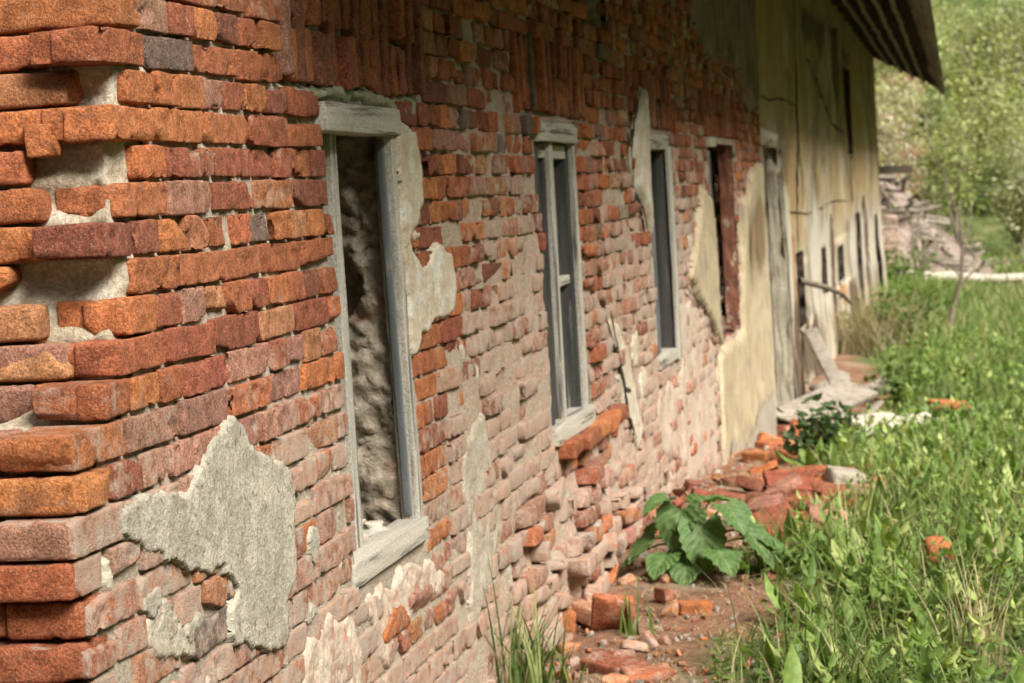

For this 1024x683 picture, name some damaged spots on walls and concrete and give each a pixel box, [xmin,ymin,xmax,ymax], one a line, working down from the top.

peeling [394,122,457,355]
peeling [629,85,654,245]
peeling [554,161,776,484]
crack [761,0,848,243]
peeling [120,415,320,654]
spalling [362,519,391,541]
spalling [382,516,457,666]